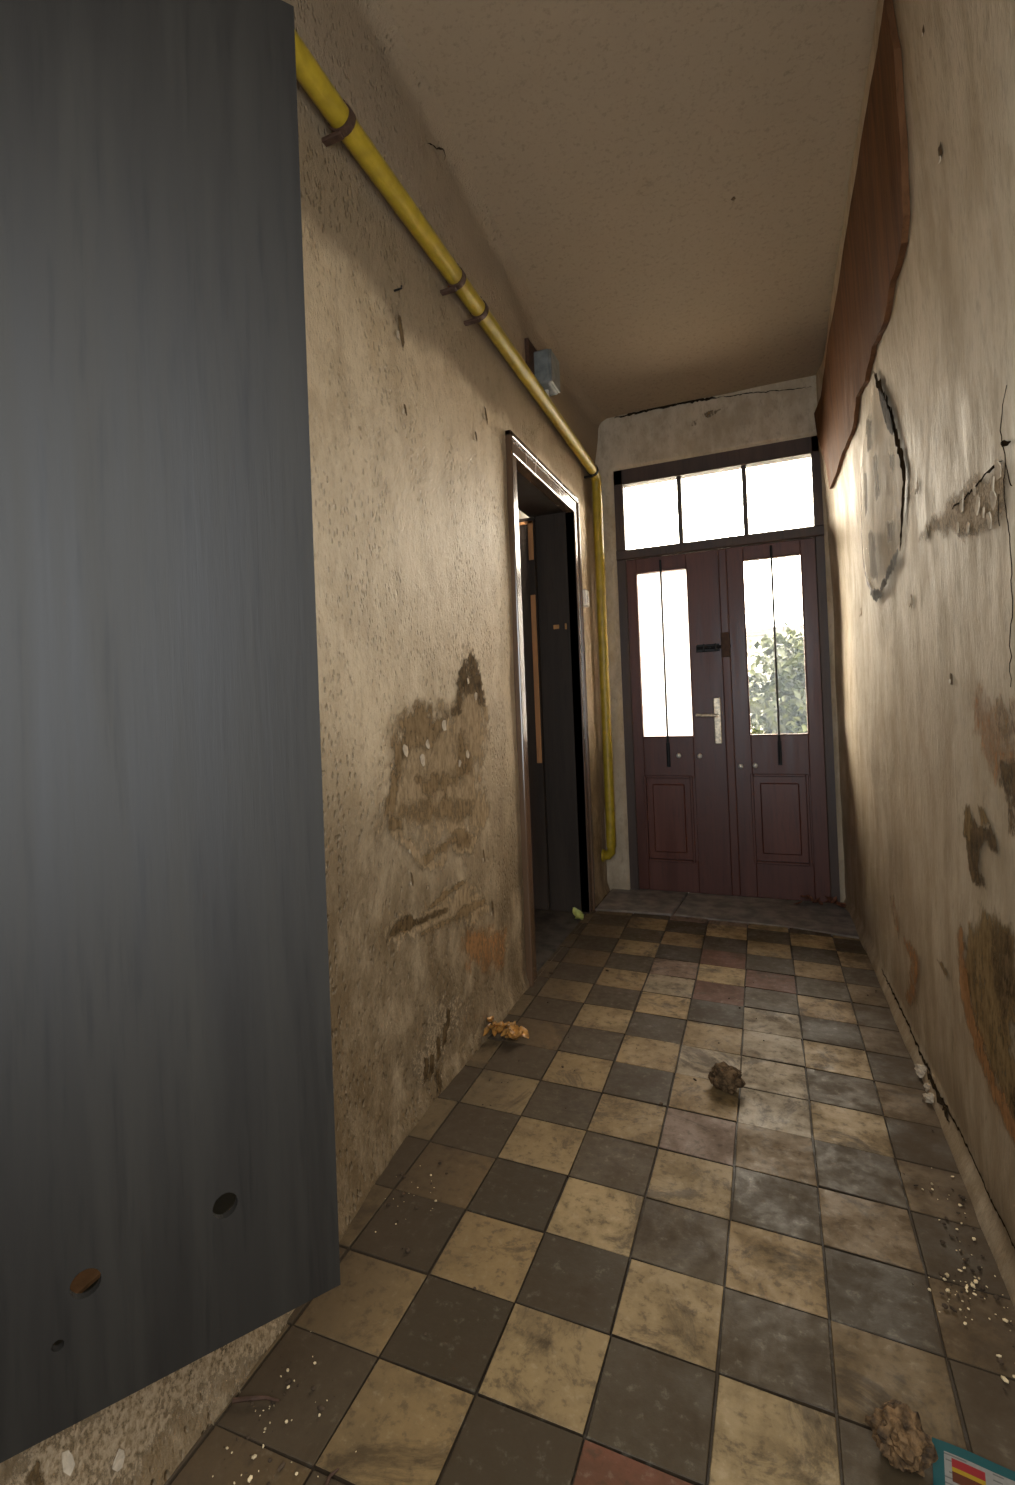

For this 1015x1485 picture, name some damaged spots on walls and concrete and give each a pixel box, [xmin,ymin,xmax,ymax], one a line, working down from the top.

flaking render [919,460,1005,542]
crack [952,385,1013,687]
water stain [963,689,1015,889]
water stain [957,907,1015,1142]